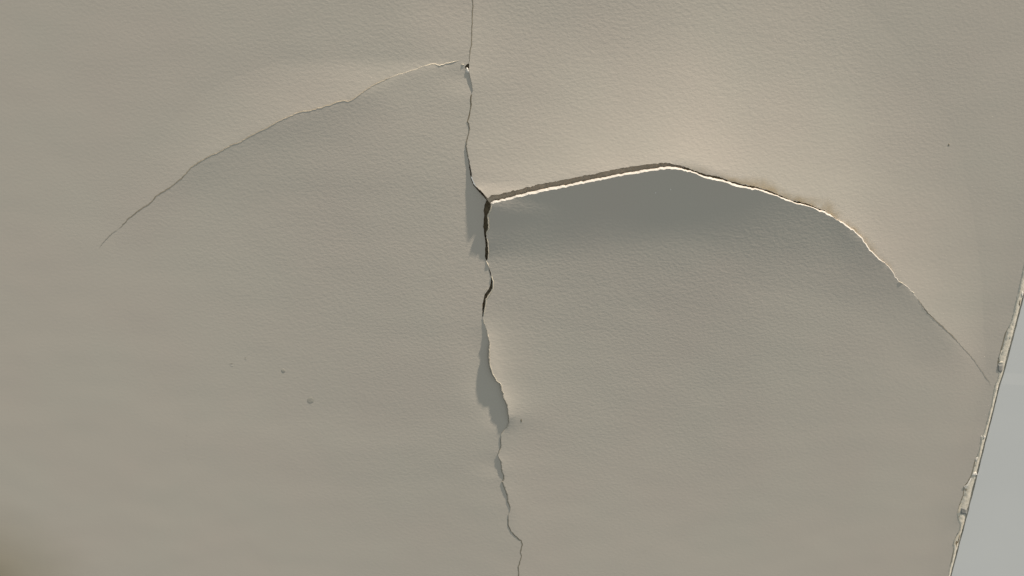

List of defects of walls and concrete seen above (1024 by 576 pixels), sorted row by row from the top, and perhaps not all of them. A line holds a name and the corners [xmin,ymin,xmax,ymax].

crack [100,0,474,246]
crack [476,163,826,576]
crack [899,282,1024,576]
spalling [949,265,1024,576]